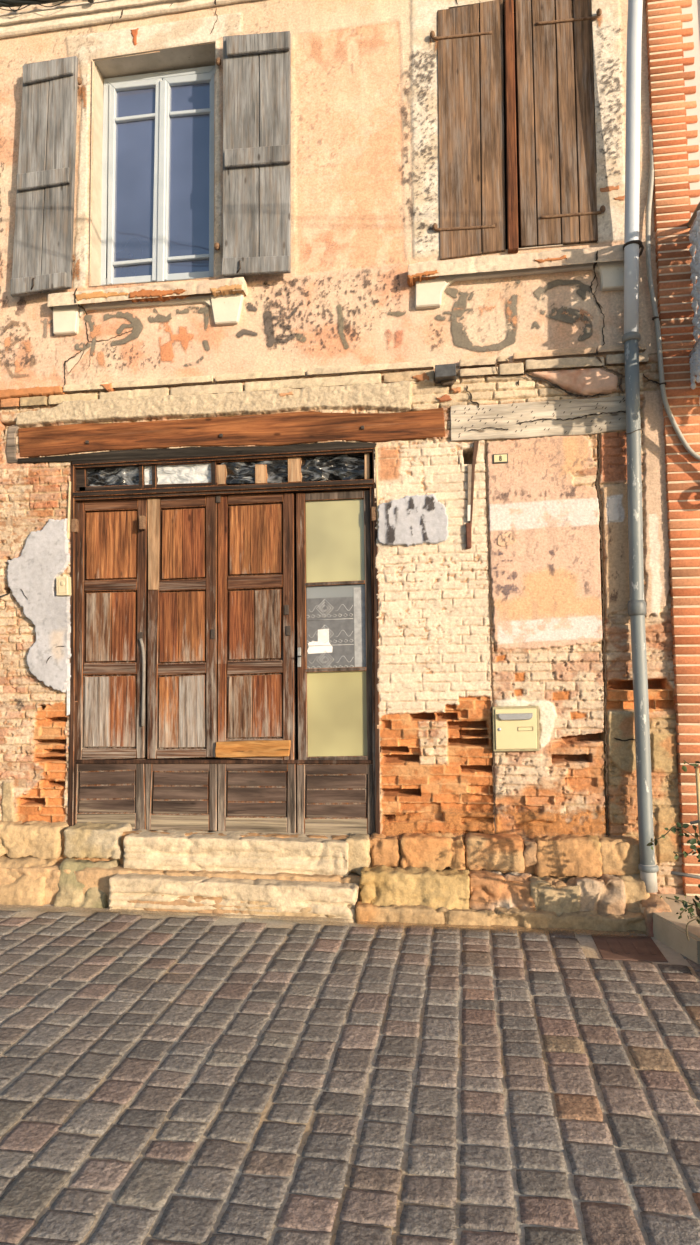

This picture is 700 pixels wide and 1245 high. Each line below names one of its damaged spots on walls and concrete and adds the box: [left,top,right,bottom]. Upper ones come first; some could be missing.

peeling [411,52,436,252]
peeling [597,28,625,201]
peeling [65,322,194,372]
spalling [73,288,191,306]
peeling [209,270,439,350]
flaking render [0,386,67,400]
spalling [604,678,676,713]
spalling [4,701,69,823]
spalling [380,695,606,836]